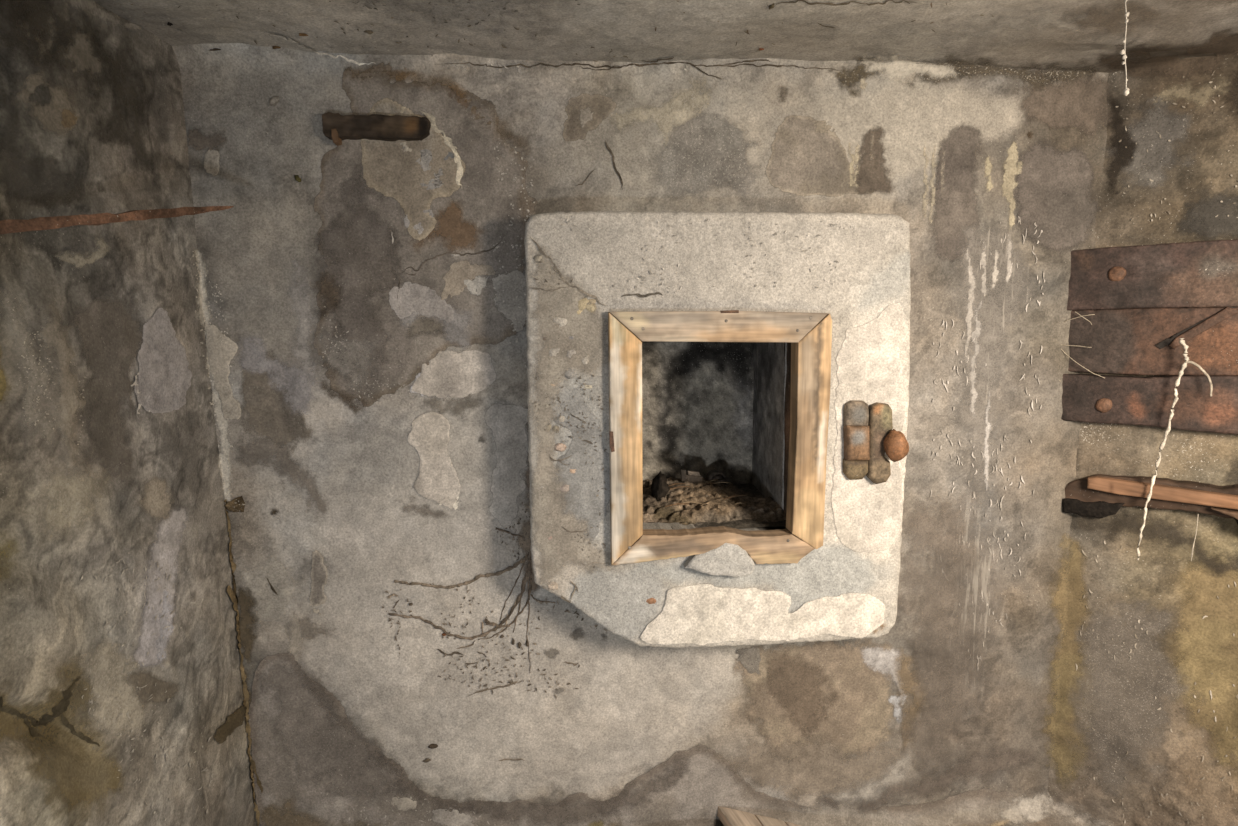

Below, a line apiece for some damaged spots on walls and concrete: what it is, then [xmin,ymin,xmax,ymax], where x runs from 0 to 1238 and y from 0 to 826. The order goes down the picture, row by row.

crack [767,0,910,28]
damp [963,1,1158,36]
damp [612,80,755,199]
damp [836,29,1238,496]
flaking render [313,63,617,590]
peeling [640,584,886,674]